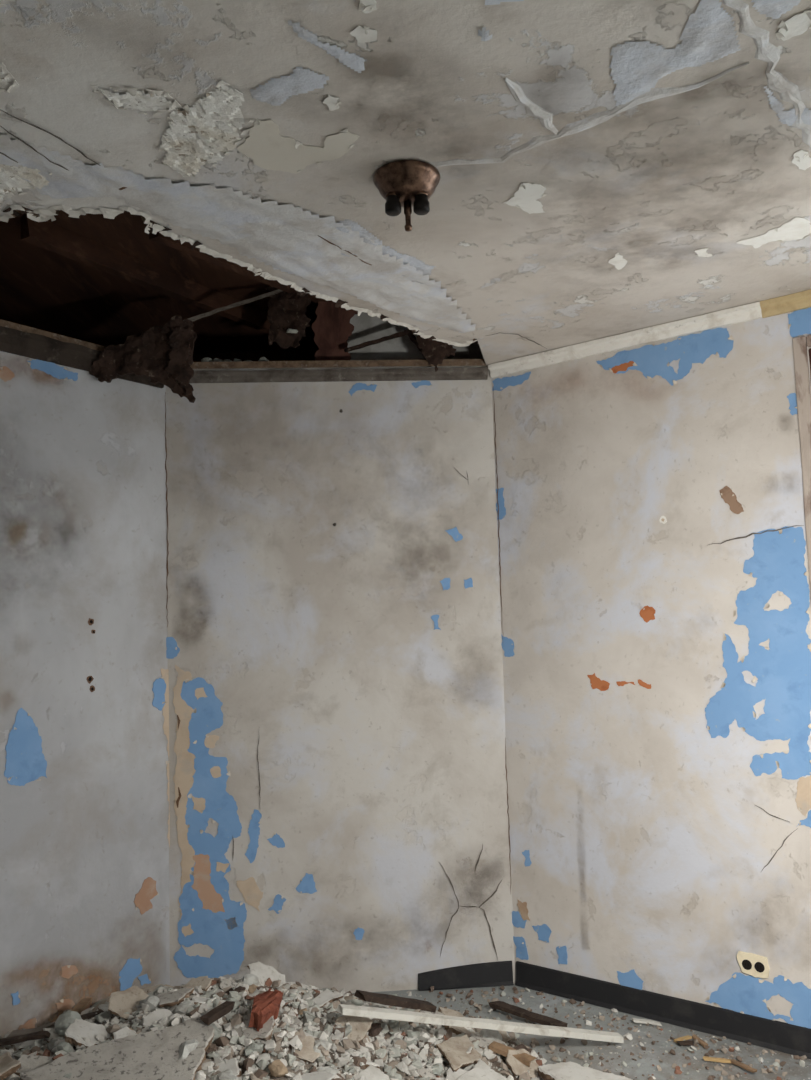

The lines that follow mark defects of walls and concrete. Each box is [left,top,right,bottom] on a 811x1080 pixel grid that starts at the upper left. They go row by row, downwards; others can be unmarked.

peeling [775,10,811,41]
peeling [91,80,360,177]
peeling [792,149,811,170]
spalling [0,164,479,347]
peeling [736,217,811,248]
peeling [27,359,78,381]
peeling [596,328,734,386]
peeling [705,526,811,828]
peeling [4,708,47,786]
peeling [152,637,286,978]
peeling [296,873,317,894]
peeling [705,972,811,1029]